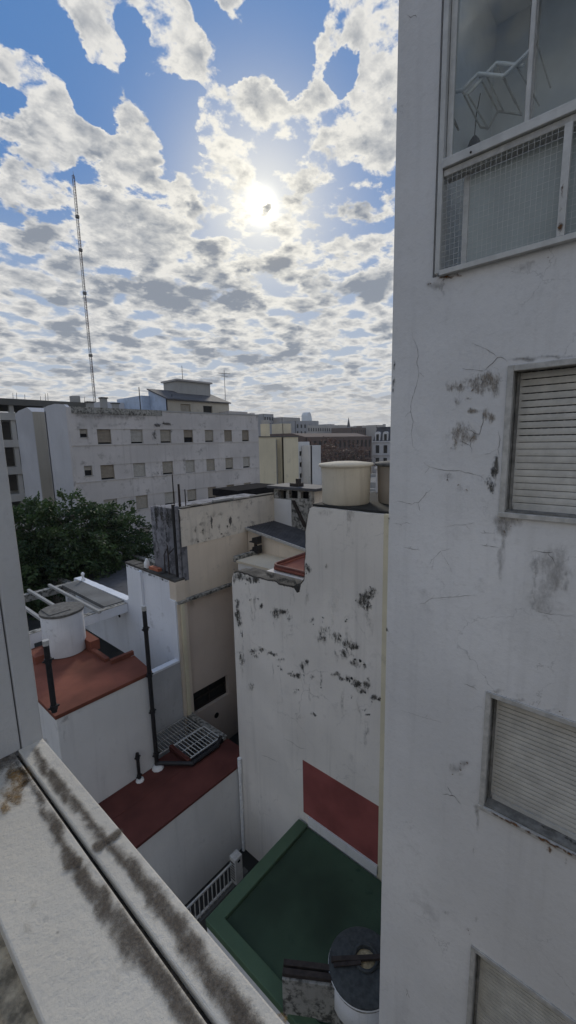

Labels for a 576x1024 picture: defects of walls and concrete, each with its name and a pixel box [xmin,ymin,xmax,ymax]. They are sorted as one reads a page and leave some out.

peeling [451,373,498,402]
damp [487,457,498,494]
damp [0,748,261,1024]